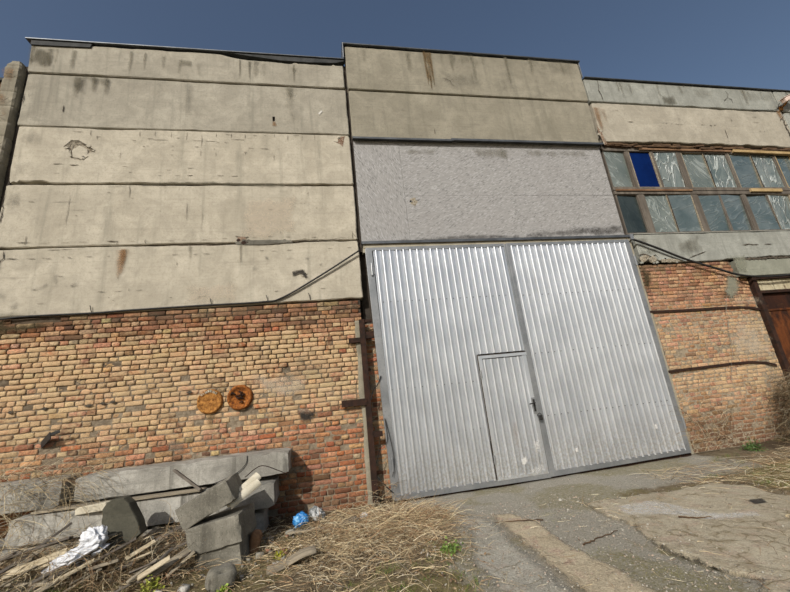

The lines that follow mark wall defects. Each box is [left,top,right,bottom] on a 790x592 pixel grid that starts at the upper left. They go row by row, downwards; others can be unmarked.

spalling [63,140,95,165]